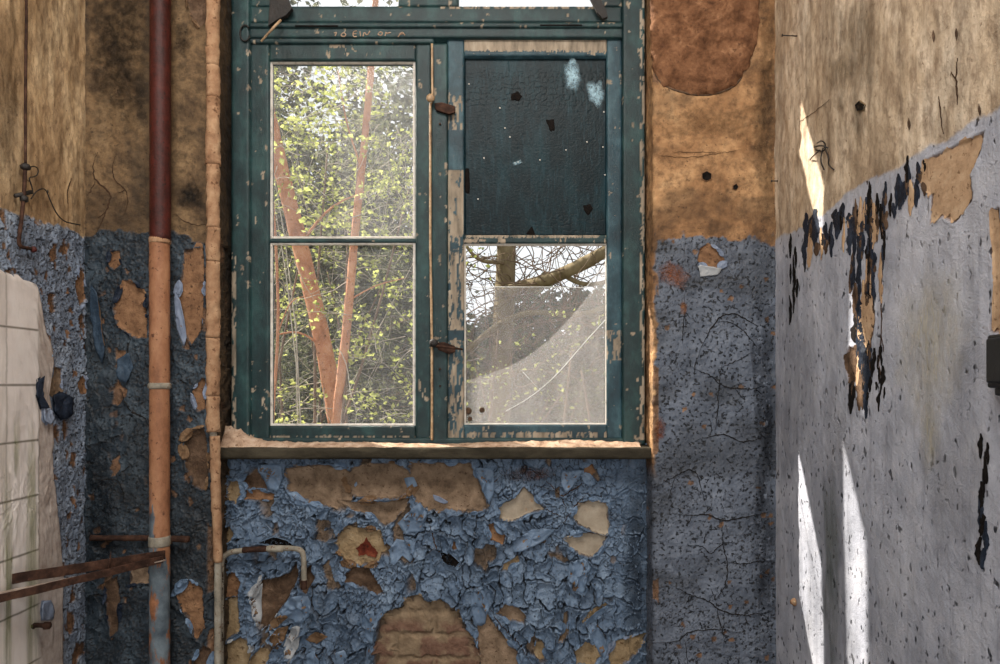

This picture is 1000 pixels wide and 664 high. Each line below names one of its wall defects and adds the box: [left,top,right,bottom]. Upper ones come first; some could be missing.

damp [99,0,139,102]
crack [67,152,128,239]
spalling [173,243,206,346]
peeling [788,135,983,419]
peeling [36,359,89,425]
crack [682,298,765,442]
spalling [225,559,328,664]
spalling [226,459,554,597]
flaking render [365,586,550,664]
spalling [561,463,614,596]
crack [653,469,771,664]
peeling [974,433,990,569]